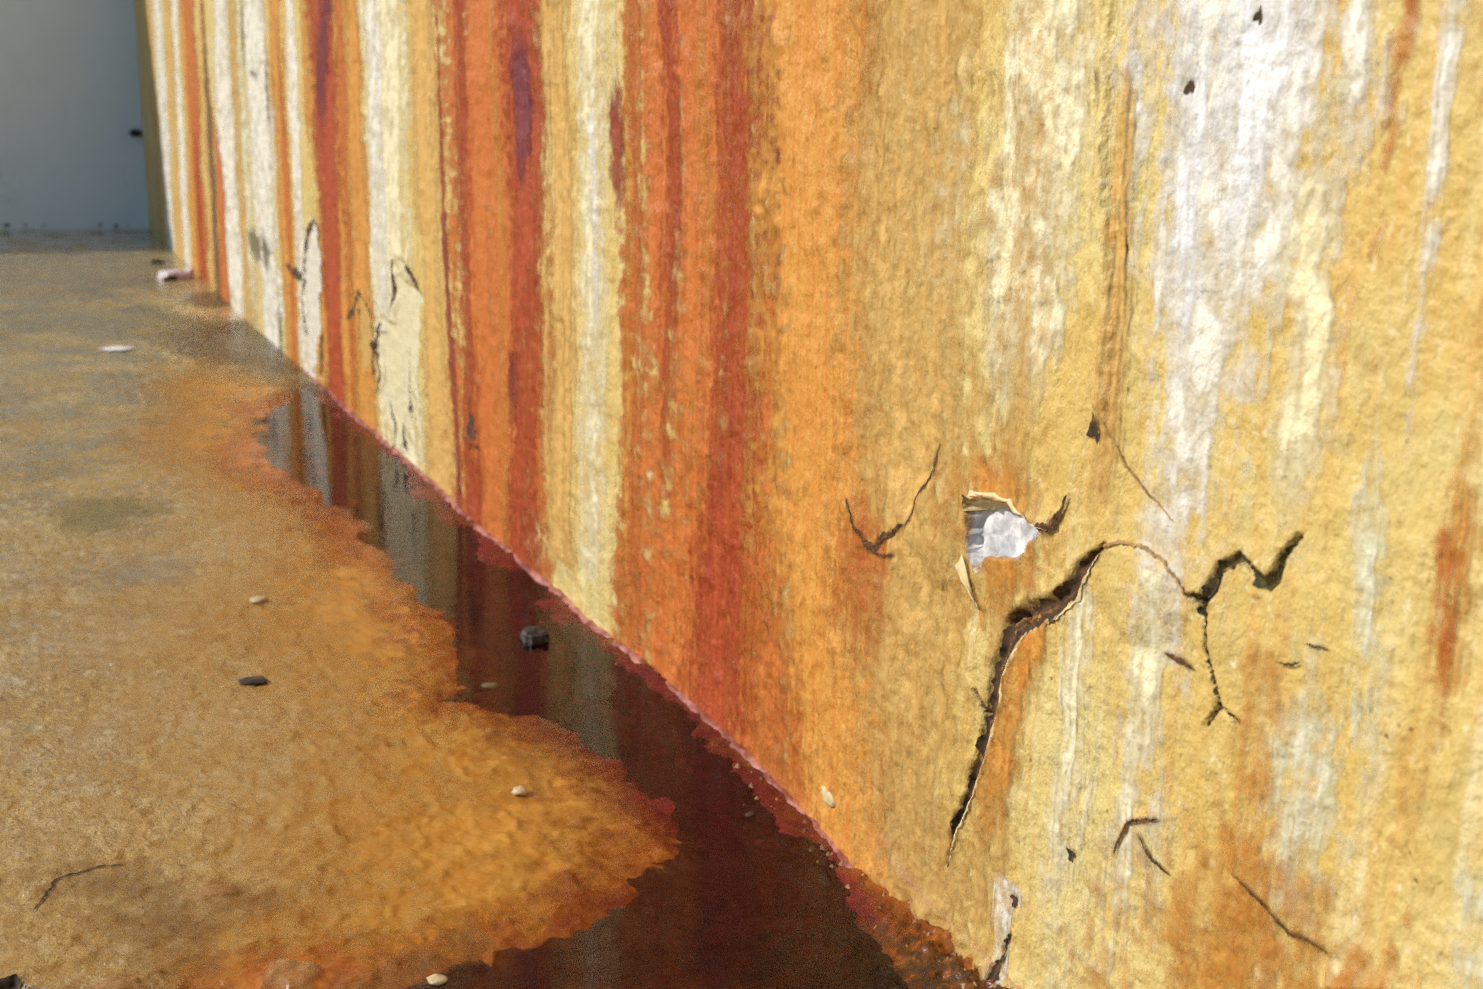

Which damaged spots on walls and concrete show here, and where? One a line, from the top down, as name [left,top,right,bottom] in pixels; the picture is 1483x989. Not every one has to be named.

corrosion [1086,68,1134,491]
corrosion [119,0,1052,989]
crack [845,446,940,558]
spalling [954,490,1044,610]
crack [1034,495,1067,534]
crack [1091,402,1174,522]
corrosion [1435,479,1474,695]
crack [947,536,1303,866]
crack [34,864,123,909]
crack [1113,818,1168,875]
crack [1235,877,1325,952]
corrosion [1296,954,1383,989]